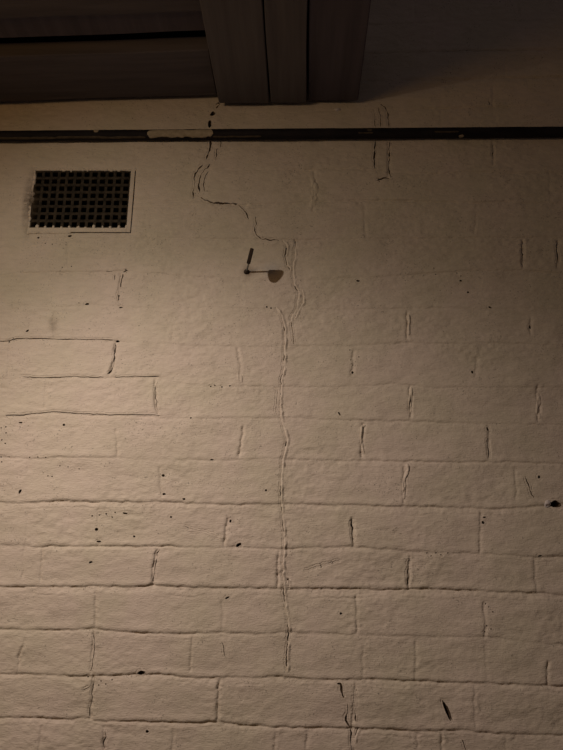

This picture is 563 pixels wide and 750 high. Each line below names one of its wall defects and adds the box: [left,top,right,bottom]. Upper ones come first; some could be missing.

crack [191,140,342,676]
crack [372,103,393,182]